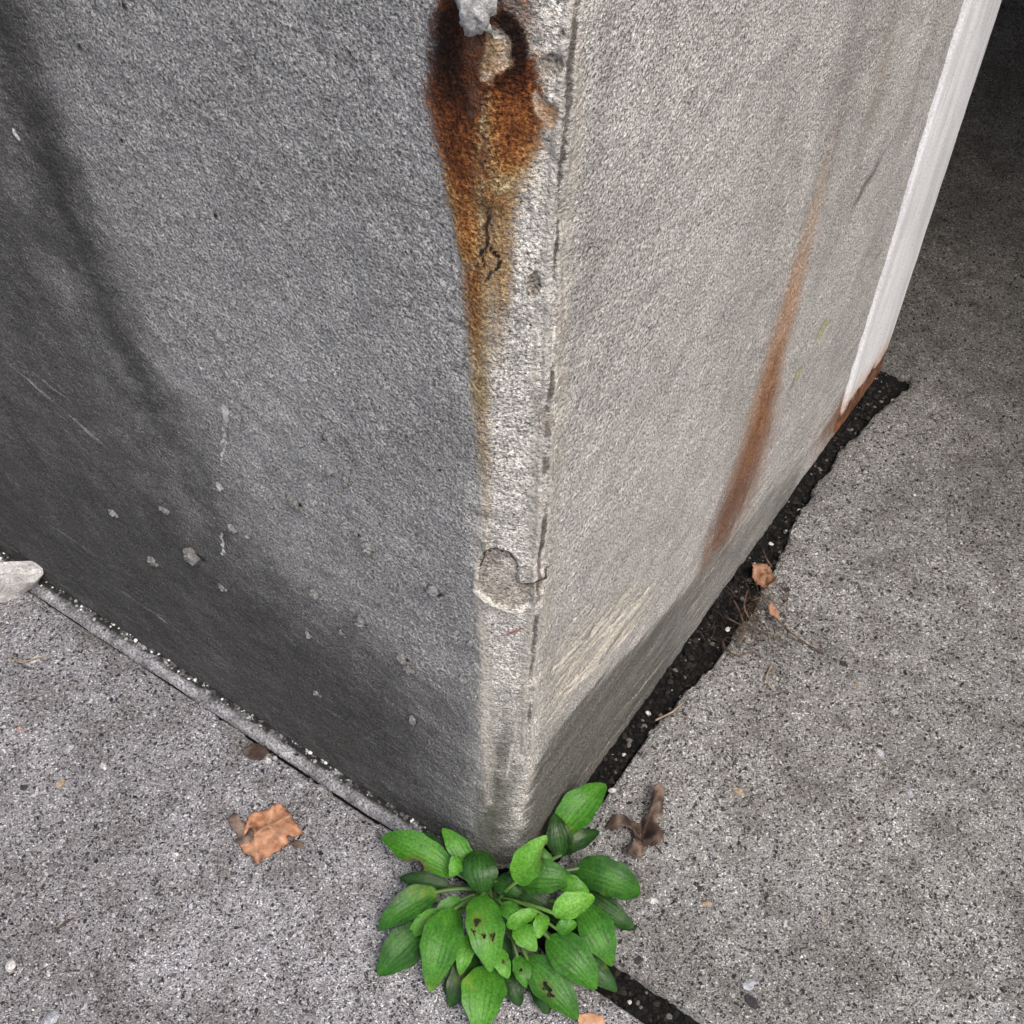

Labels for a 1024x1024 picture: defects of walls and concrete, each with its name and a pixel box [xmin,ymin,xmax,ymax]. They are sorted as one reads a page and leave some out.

corrosion [423,0,545,515]
crack [479,209,503,283]
crack [520,0,585,755]
corrosion [703,182,823,564]
spalling [472,548,548,614]